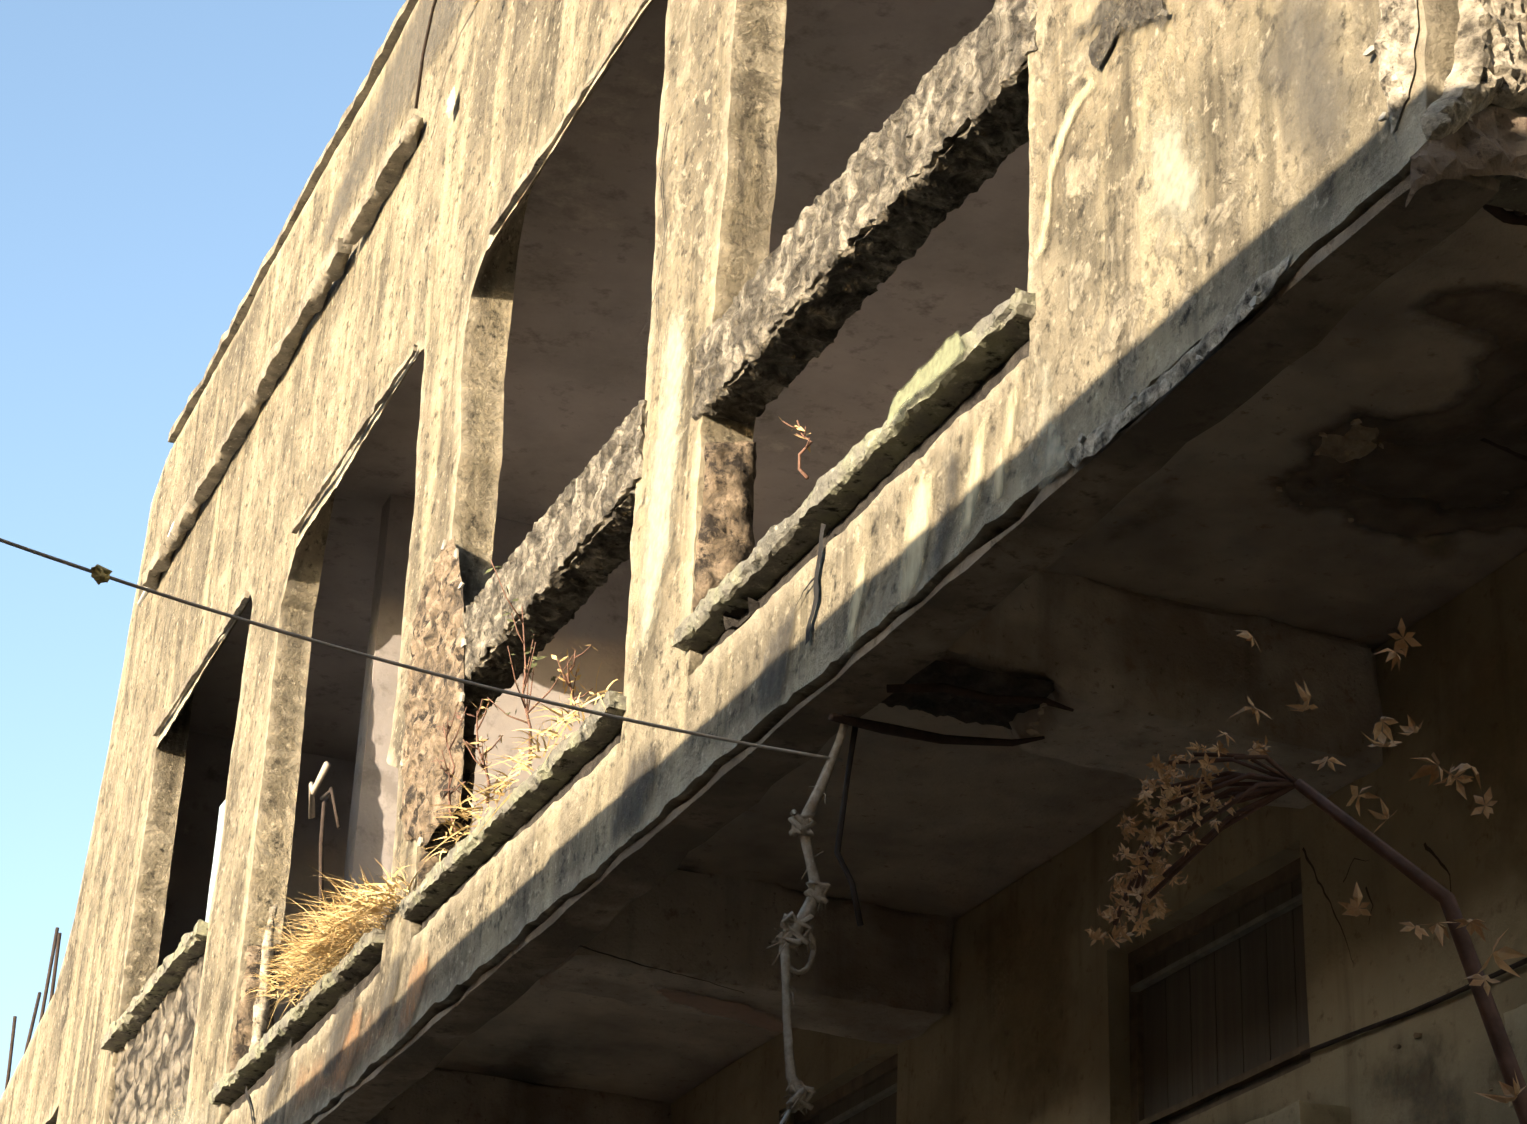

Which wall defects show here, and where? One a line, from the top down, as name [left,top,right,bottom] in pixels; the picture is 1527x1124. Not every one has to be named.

spalling [1363,0,1418,133]
spalling [828,660,1074,747]
crack [1302,847,1374,962]
crack [1424,843,1451,892]